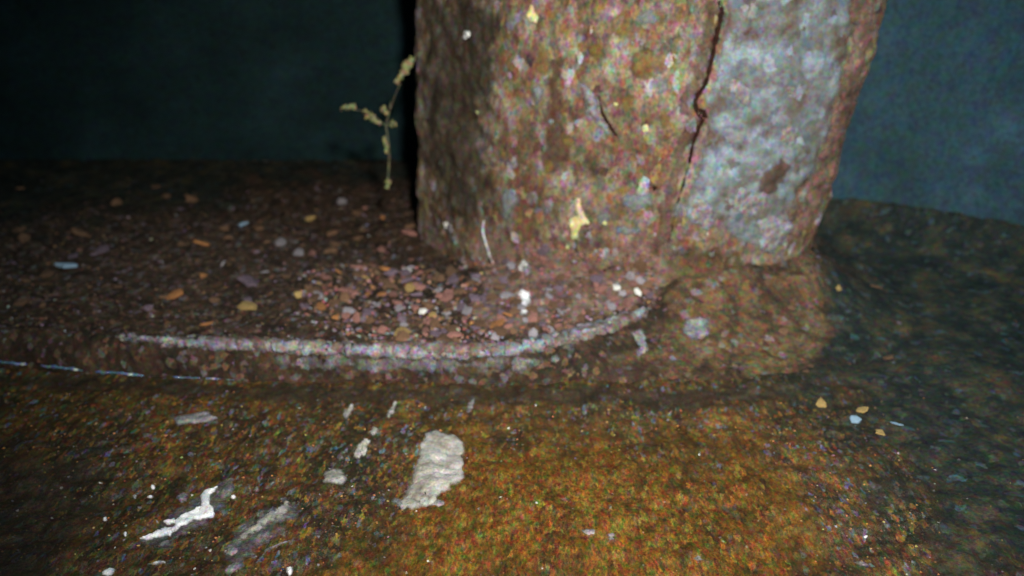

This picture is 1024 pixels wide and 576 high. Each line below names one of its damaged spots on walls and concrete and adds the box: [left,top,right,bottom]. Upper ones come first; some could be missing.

crack [668,1,724,242]